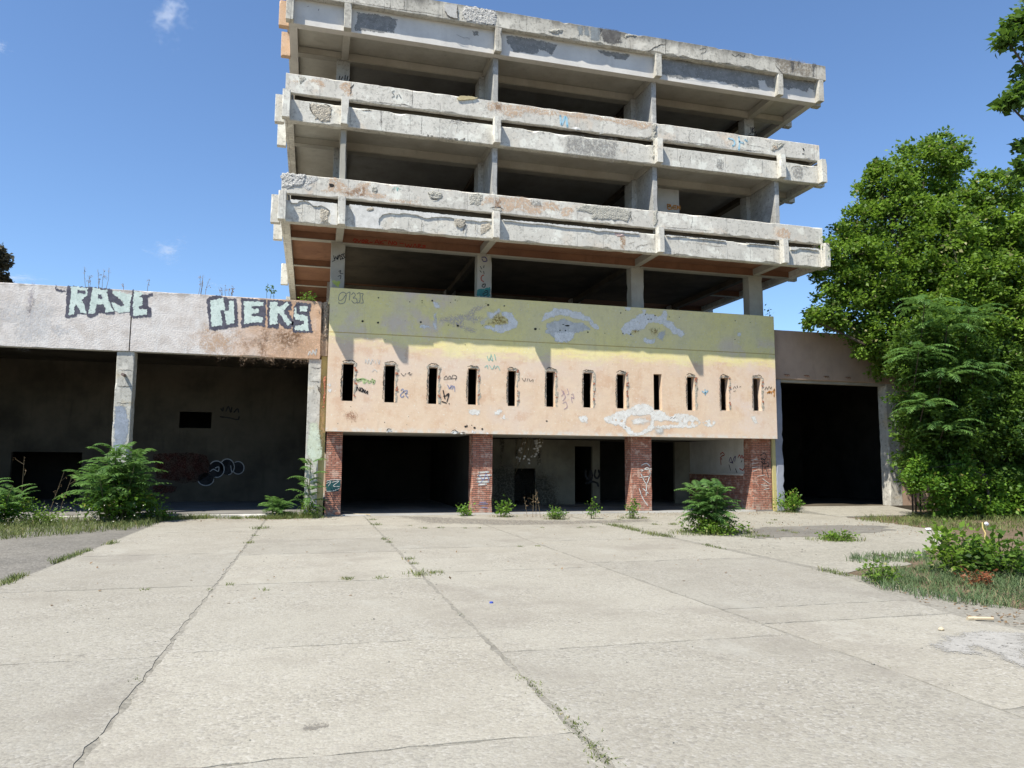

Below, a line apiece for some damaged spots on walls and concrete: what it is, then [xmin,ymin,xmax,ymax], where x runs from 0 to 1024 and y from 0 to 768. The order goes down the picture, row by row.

flaking render [354,12,398,33]
spalling [444,4,497,36]
flaking render [506,29,563,55]
spalling [309,103,332,122]
flaking render [280,172,639,237]
peeling [480,309,518,333]
peeling [542,308,599,343]
peeling [621,307,685,344]
water stain [185,321,329,366]
peeling [604,370,732,436]